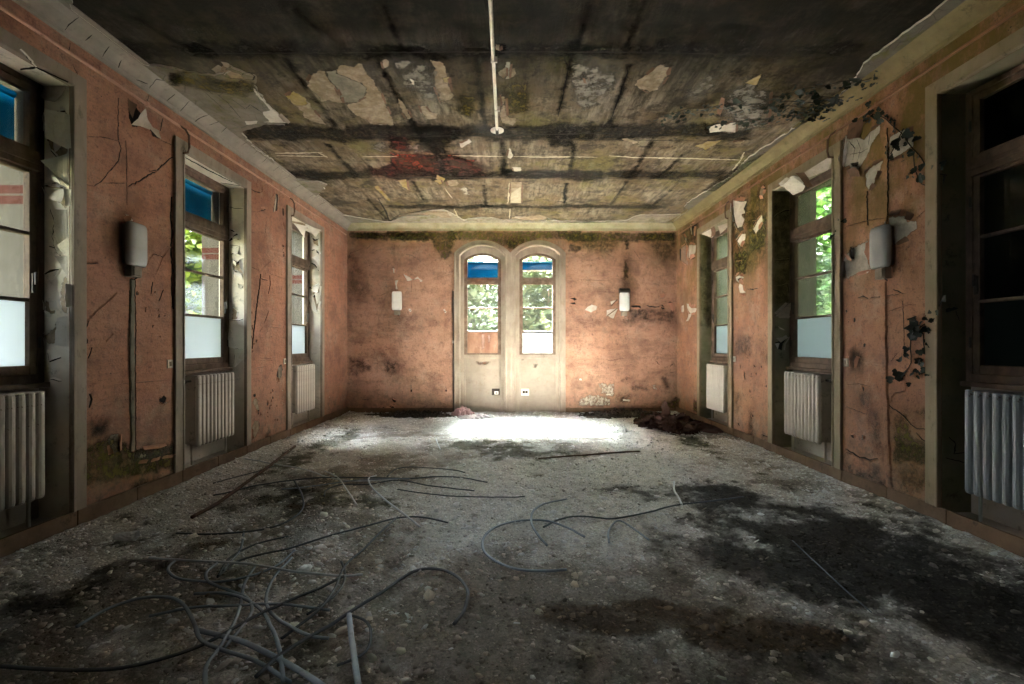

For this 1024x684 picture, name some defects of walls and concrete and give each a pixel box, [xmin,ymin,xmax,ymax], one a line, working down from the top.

peeling [828,0,965,104]
crack [20,17,691,364]
peeling [58,0,763,265]
water stain [120,2,864,325]
peeling [570,297,641,320]
peeling [736,272,746,296]
peeling [778,119,914,197]
peeling [839,241,871,280]
peeling [884,209,917,245]
mould [87,421,173,485]